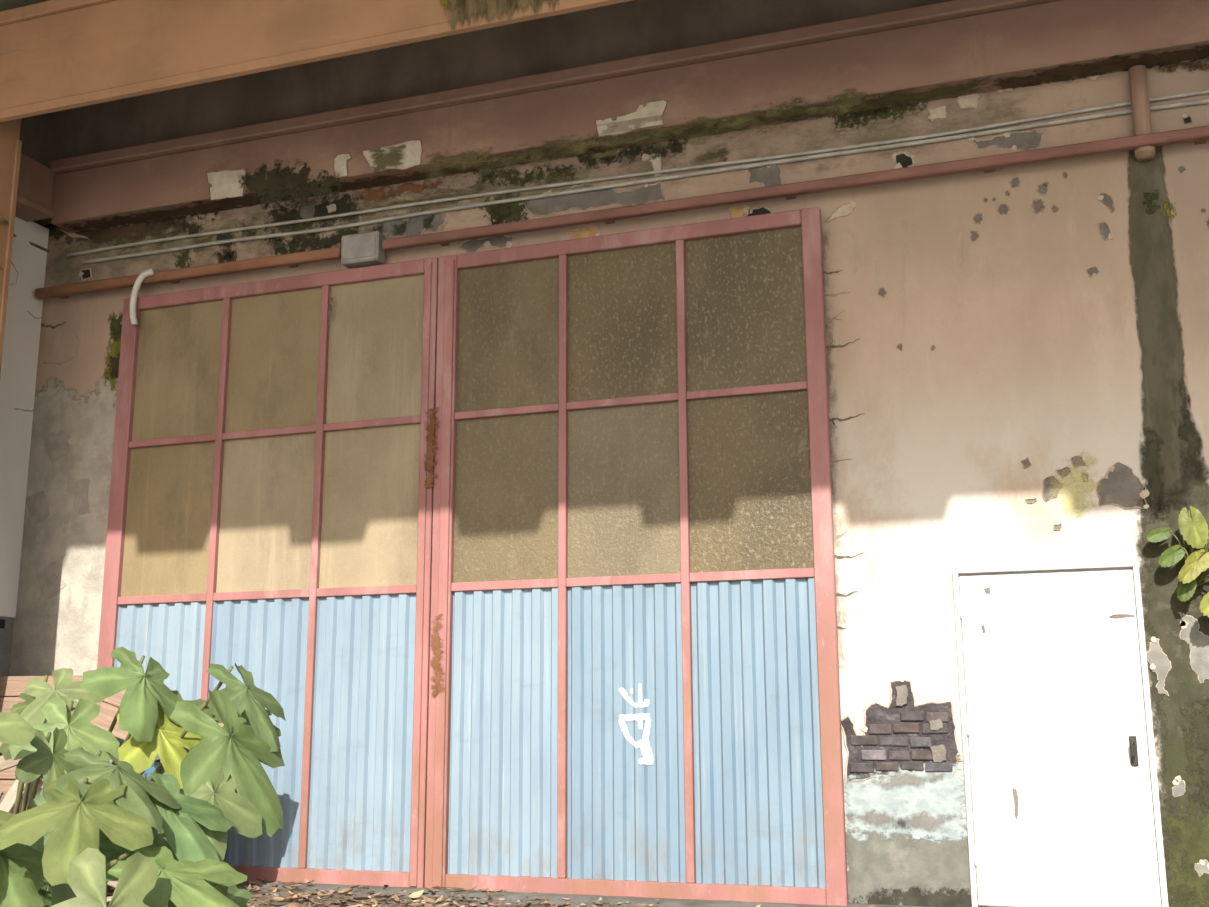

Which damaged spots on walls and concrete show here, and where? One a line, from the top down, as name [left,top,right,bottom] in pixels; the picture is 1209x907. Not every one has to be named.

leakage [440,0,557,29]
leakage [45,145,633,248]
peeling [333,140,423,178]
peeling [595,99,668,137]
leakage [1127,146,1209,552]
corrosion [424,407,439,488]
spalling [1025,455,1149,510]
flaking render [9,377,118,676]
leakage [1136,563,1153,647]
corrosion [430,614,445,696]
flaking render [841,678,974,844]
leakage [1141,664,1168,805]